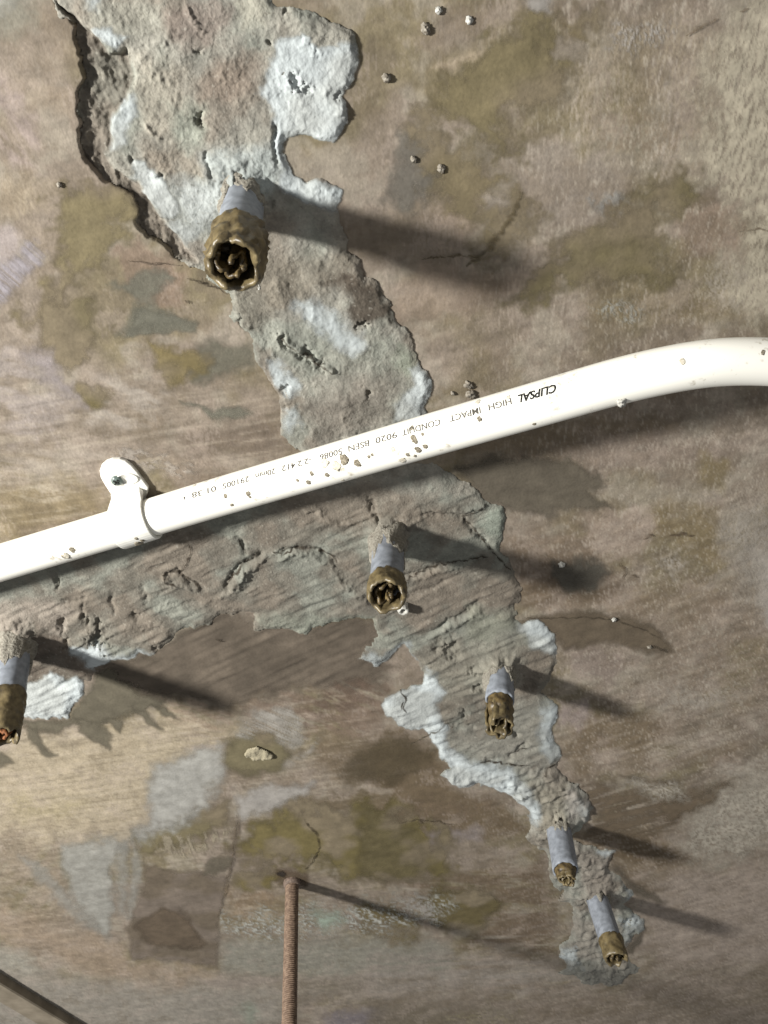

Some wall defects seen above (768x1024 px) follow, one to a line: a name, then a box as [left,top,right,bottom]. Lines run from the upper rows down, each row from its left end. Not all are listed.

spalling [53,0,432,452]
leakage [406,0,604,263]
leakage [518,1,768,323]
leakage [60,840,136,934]
peeling [127,824,239,967]
peeling [244,746,274,761]
leakage [131,706,501,944]
leakage [382,675,540,825]